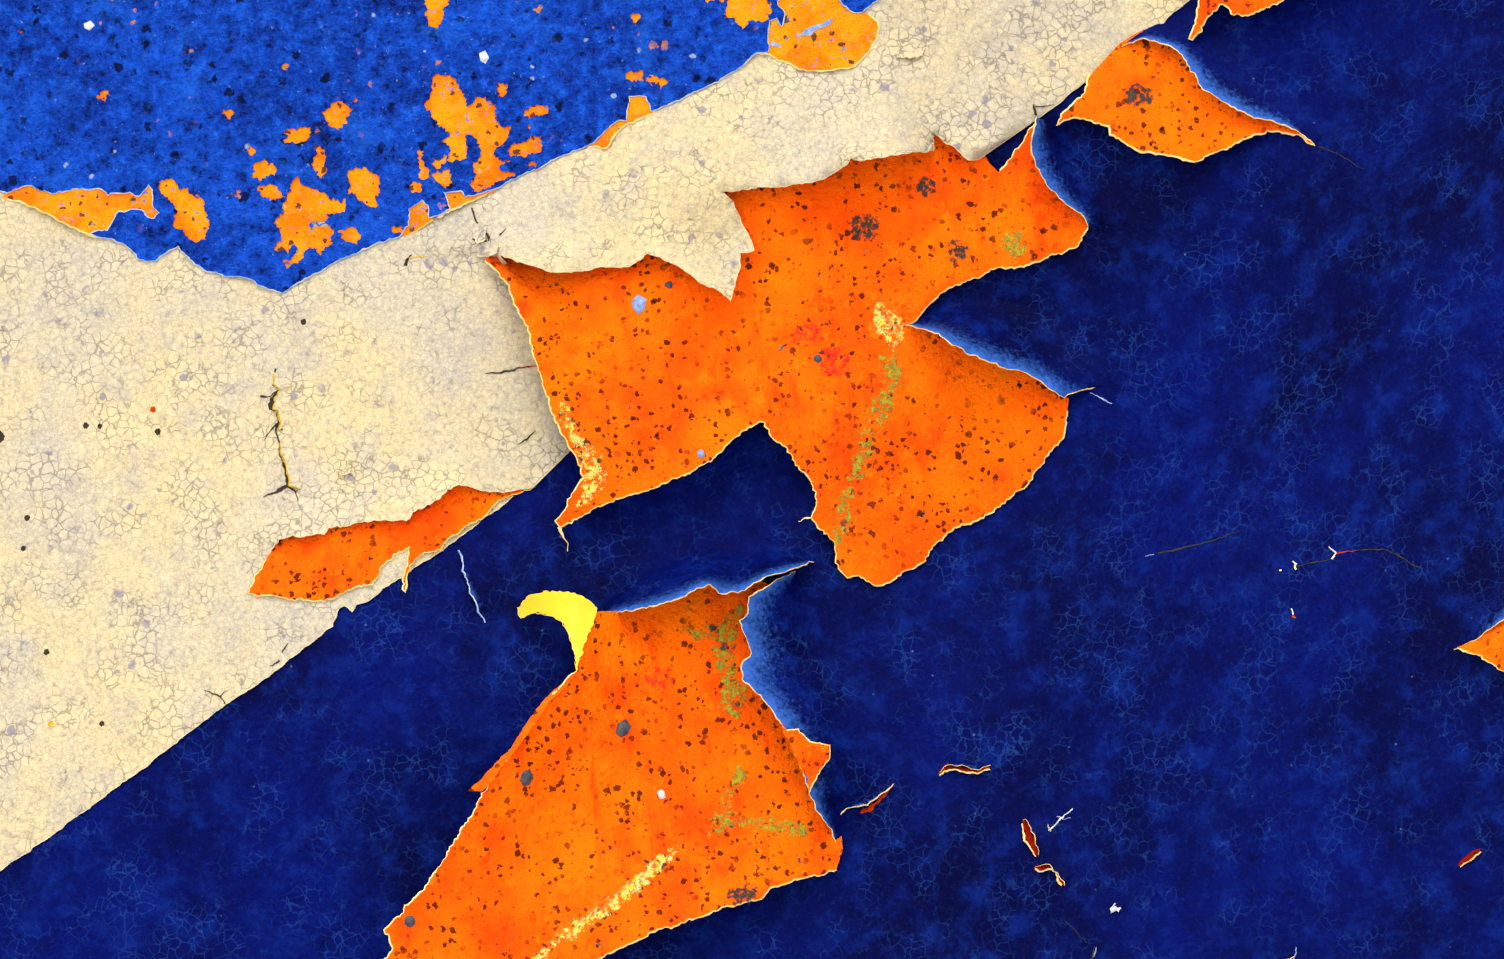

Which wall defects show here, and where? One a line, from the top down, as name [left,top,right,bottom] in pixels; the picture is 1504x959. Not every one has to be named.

peeling [424,0,450,28]
peeling [3,178,210,243]
peeling [231,94,381,268]
peeling [392,74,549,236]
peeling [472,0,1325,587]
crack [260,368,309,500]
peeling [1447,566,1504,672]
peeling [248,485,897,959]
peeling [938,751,1002,776]
peeling [1021,808,1077,886]
peeling [1110,900,1126,913]